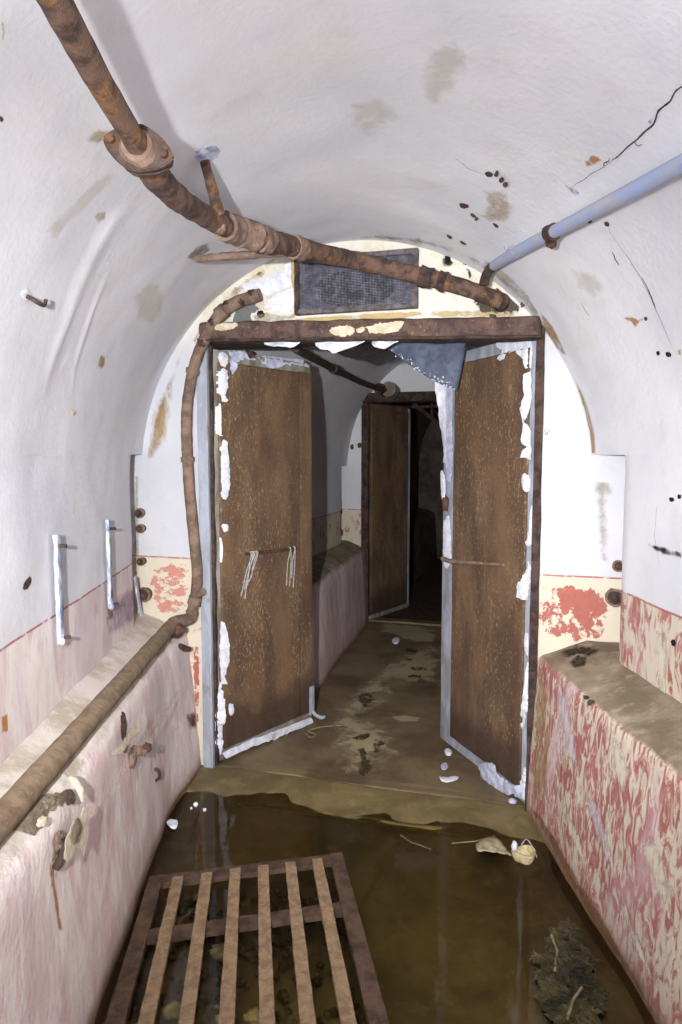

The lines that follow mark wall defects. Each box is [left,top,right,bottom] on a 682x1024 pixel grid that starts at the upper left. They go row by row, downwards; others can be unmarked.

crack [575,86,682,185]
peeling [214,260,525,354]
damp [151,403,165,454]
peeling [150,565,186,613]
peeling [539,585,608,643]
peeling [113,692,178,776]
spalling [13,775,100,863]
corrosion [50,855,61,929]